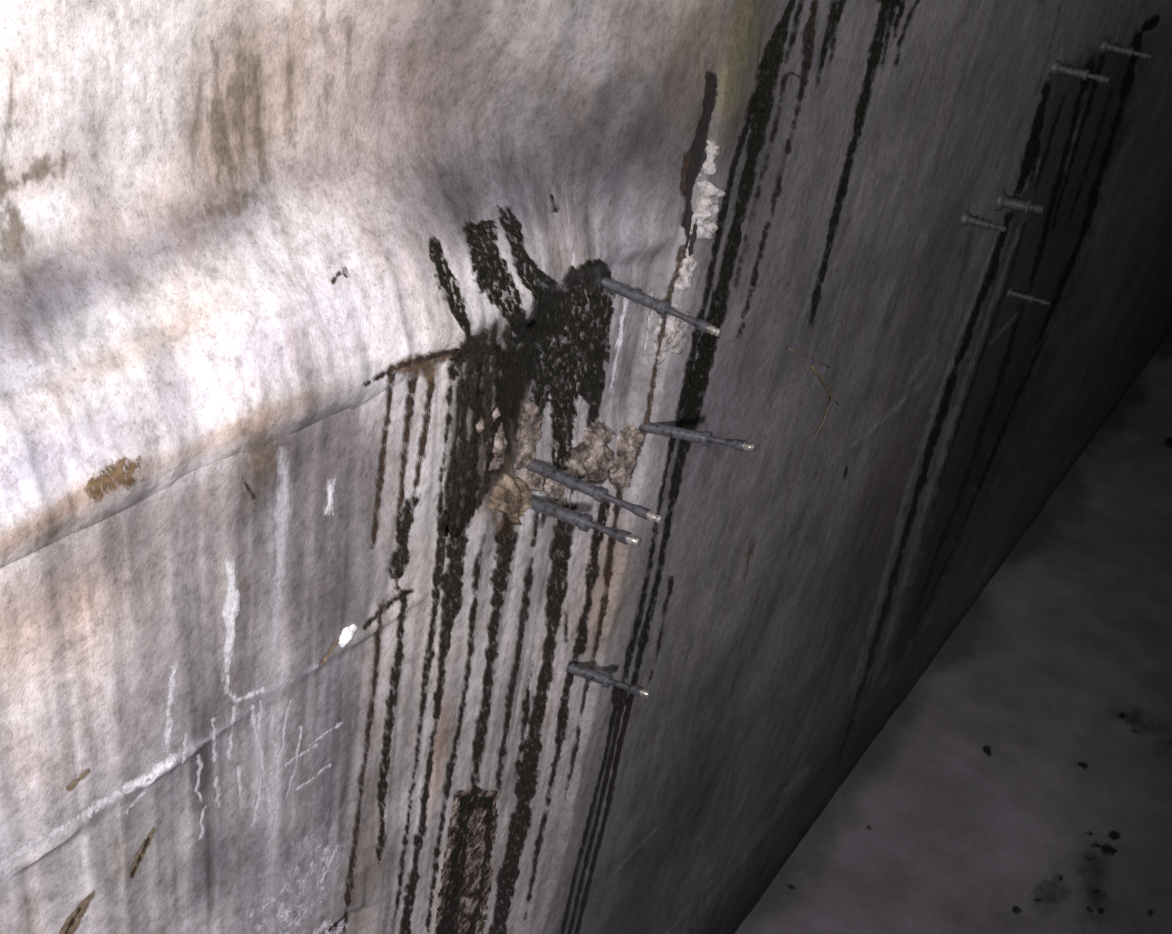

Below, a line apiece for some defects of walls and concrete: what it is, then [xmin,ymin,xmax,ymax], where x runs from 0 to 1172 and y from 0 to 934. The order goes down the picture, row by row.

corrosion [86,456,144,502]
water stain [343,495,421,932]
water stain [391,206,629,934]
spalling [470,397,644,550]
spalling [643,140,726,365]
water stain [562,0,847,934]
water stain [809,0,921,328]
water stain [835,14,1161,768]